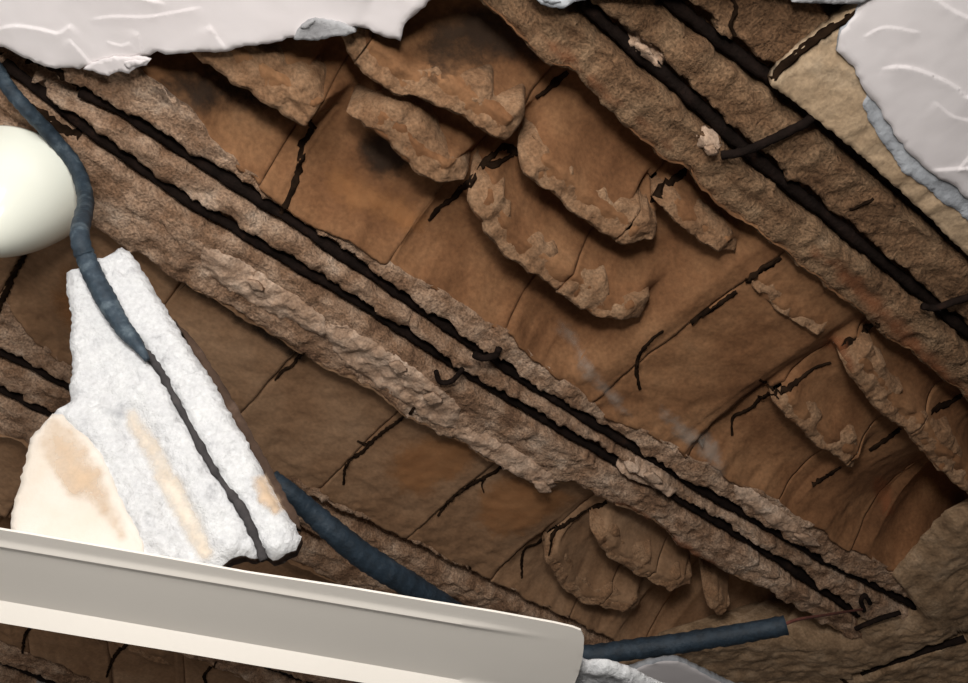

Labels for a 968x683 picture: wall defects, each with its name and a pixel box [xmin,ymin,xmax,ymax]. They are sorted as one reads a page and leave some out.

peeling [294,17,357,41]
peeling [537,0,581,9]
peeling [83,55,152,76]
crack [279,119,317,215]
water stain [361,136,406,173]
spalling [696,125,722,156]
crack [690,256,782,325]
spalling [200,243,557,493]
crack [730,322,881,436]
water stain [53,436,100,496]
water stain [128,412,212,558]
crack [342,407,416,485]